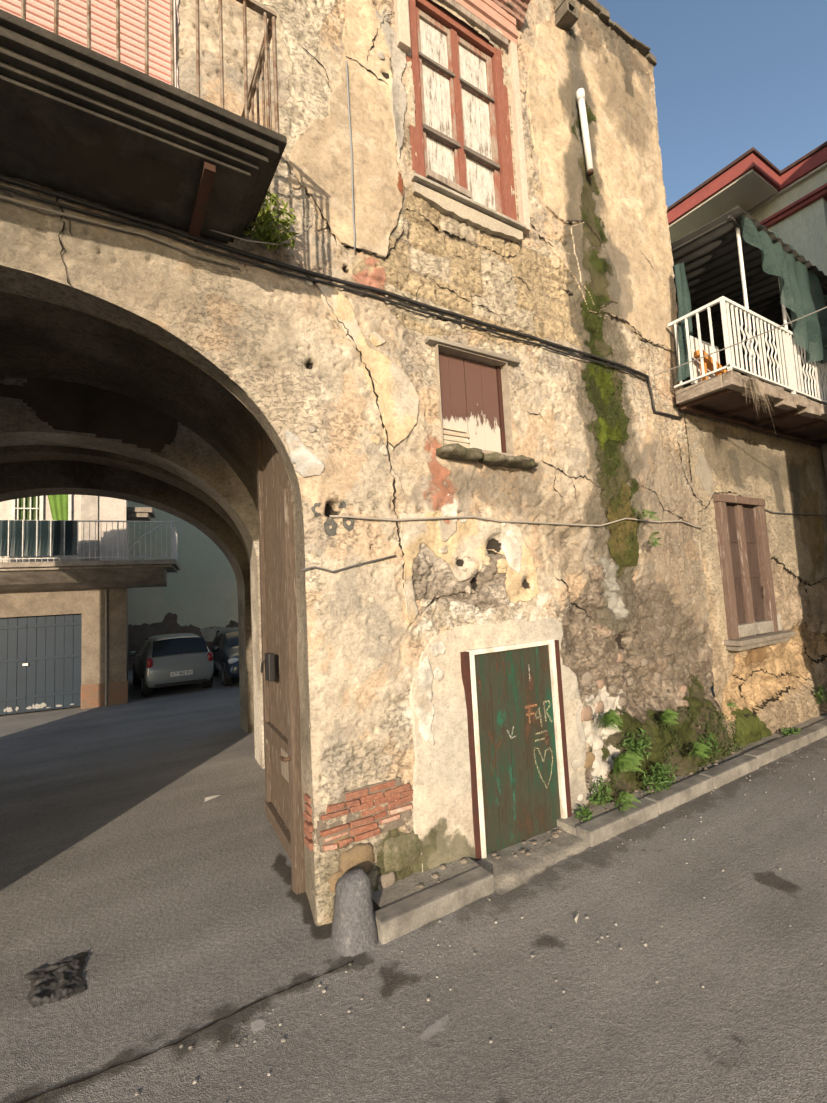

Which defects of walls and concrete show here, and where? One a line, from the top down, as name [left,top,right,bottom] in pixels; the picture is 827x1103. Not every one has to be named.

crack [55,190,73,288]
peeling [256,0,675,353]
peeling [306,276,419,455]
leakage [559,25,644,635]
crack [292,255,476,614]
peeling [398,494,540,626]
crack [771,556,826,607]
crack [730,643,827,718]
flaking render [303,777,422,893]